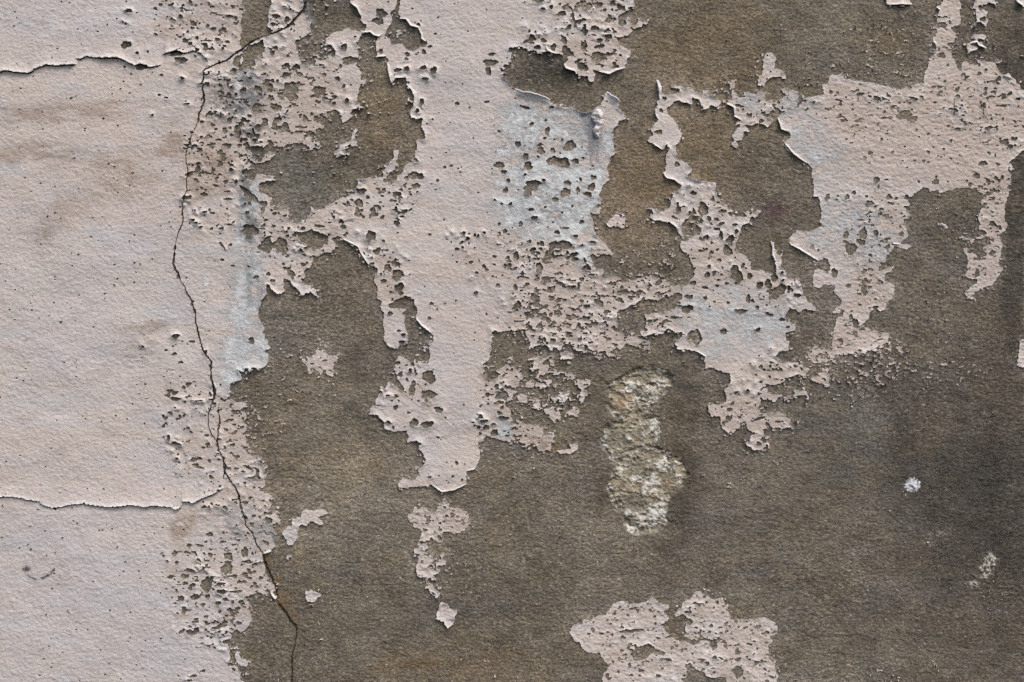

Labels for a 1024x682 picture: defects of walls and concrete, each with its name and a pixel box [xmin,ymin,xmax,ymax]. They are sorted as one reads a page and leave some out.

crack [0,2,306,681]
peeling [305,589,321,602]
peeling [231,0,1024,581]
peeling [569,589,780,682]